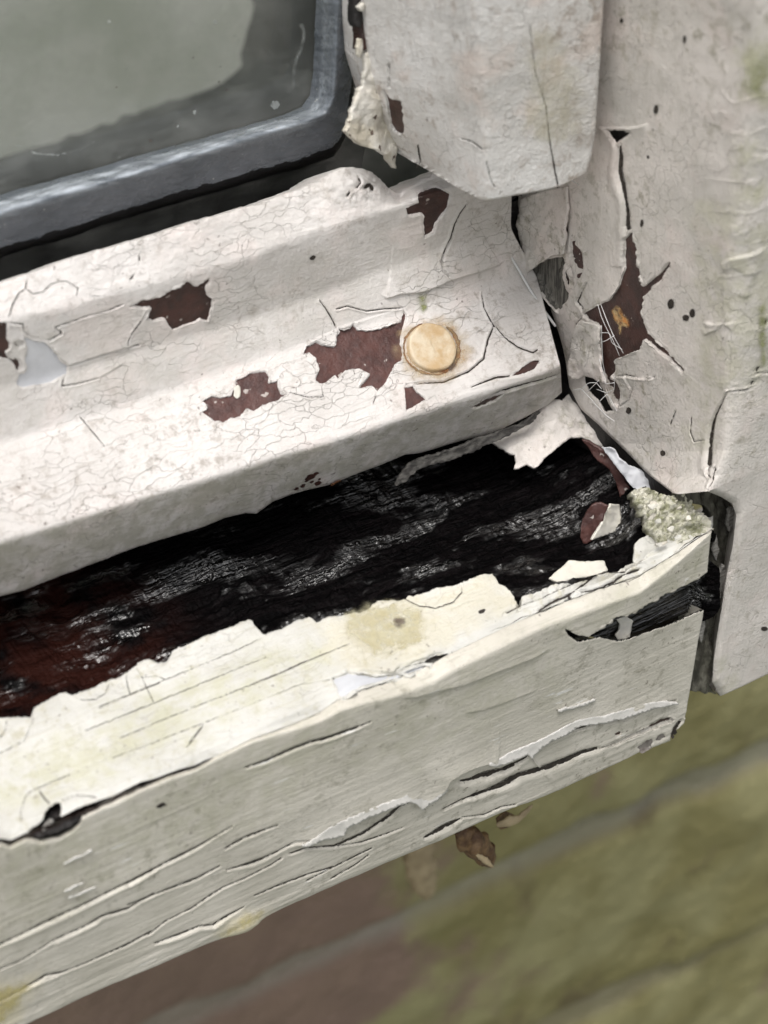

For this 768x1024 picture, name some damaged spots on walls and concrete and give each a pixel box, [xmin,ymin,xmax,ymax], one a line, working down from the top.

crack [347,178,374,196]
peeling [404,185,452,238]
peeling [129,278,214,332]
peeling [302,309,408,395]
crack [321,303,396,328]
rust [403,323,464,376]
crack [417,298,551,393]
peeling [567,220,684,414]
peeling [201,370,288,424]
peeling [491,394,650,489]
crack [0,639,446,843]
crack [0,721,597,996]